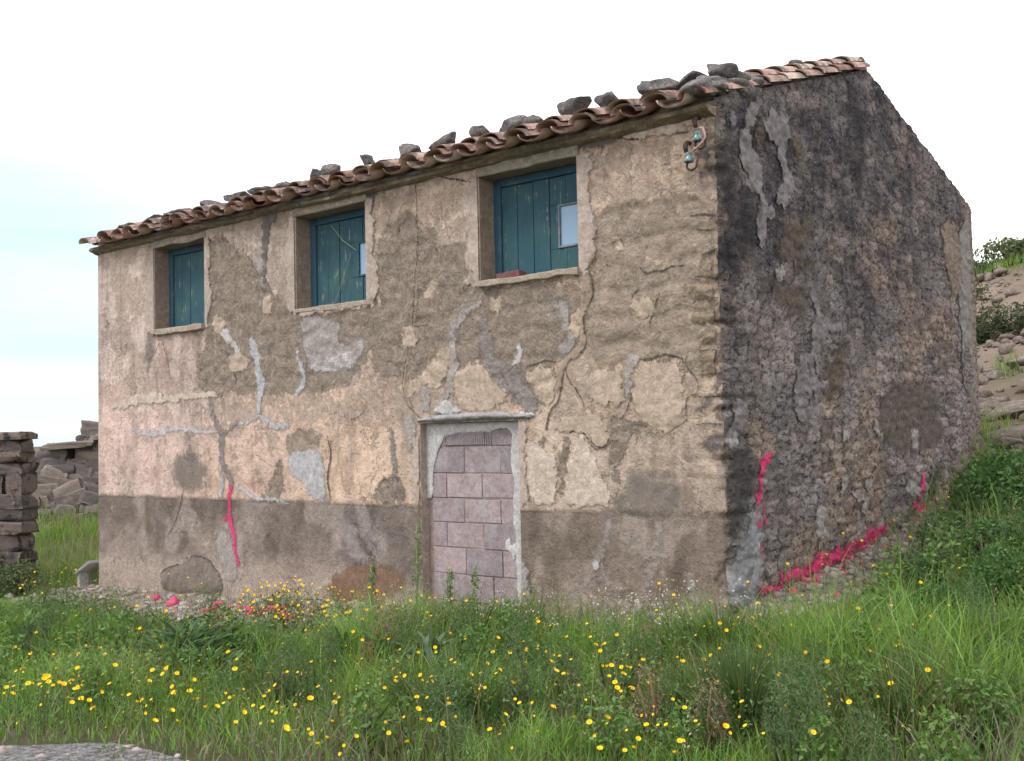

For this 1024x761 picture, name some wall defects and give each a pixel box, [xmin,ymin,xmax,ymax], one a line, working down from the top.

crack [130,328,290,504]
crack [293,348,306,397]
flaking render [111,192,721,510]
crack [402,185,721,450]
water stain [726,431,739,449]
water stain [911,428,919,450]
water stain [342,523,382,564]
water stain [573,471,685,601]
water stain [816,472,873,559]
water stain [905,464,932,512]